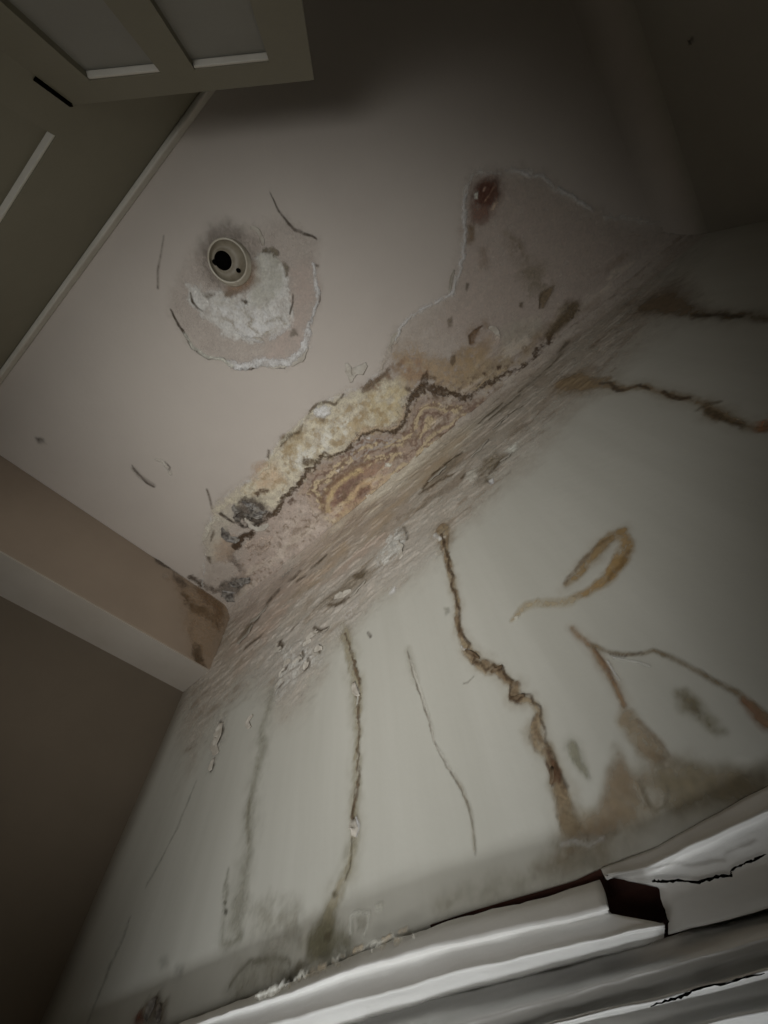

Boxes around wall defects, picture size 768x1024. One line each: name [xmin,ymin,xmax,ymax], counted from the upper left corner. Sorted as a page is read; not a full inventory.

leakage [638,292,768,321]
leakage [555,372,768,432]
spalling [170,171,680,771]
leakage [155,559,226,666]
leakage [512,528,633,620]
leakage [557,628,768,864]
crack [652,854,767,884]
crack [651,973,765,1007]